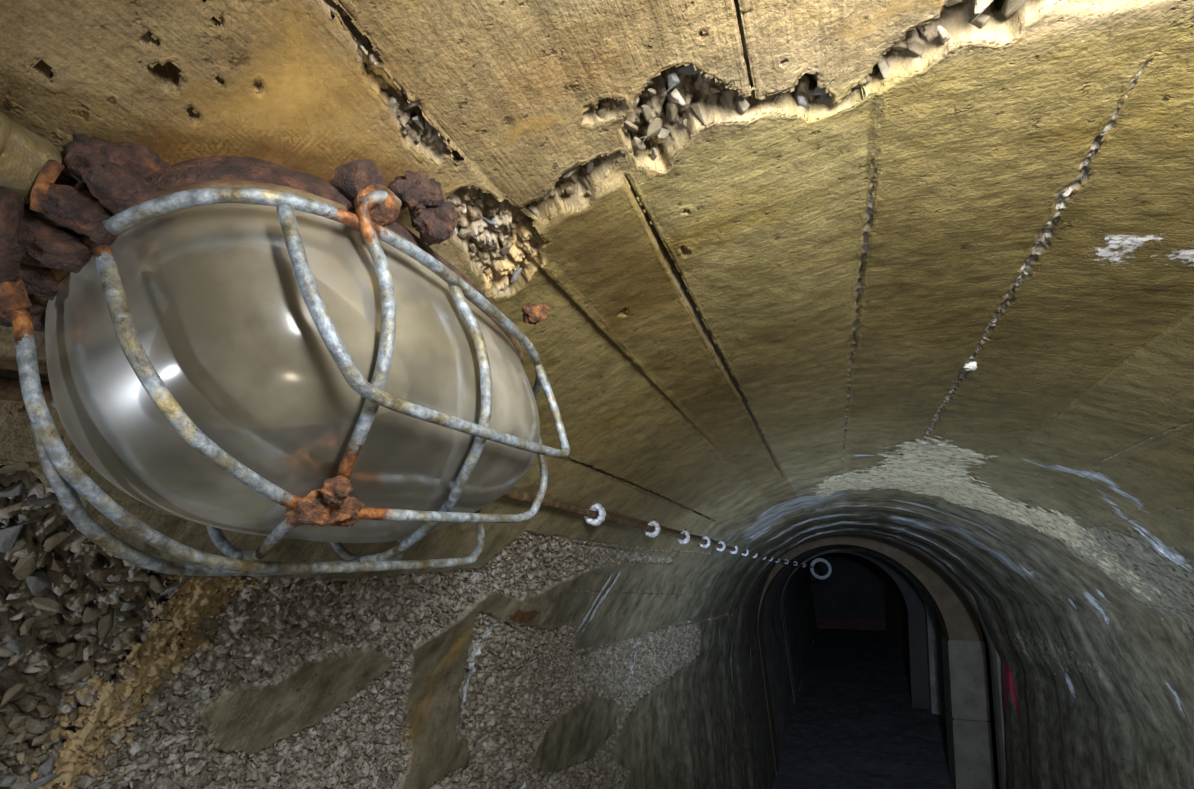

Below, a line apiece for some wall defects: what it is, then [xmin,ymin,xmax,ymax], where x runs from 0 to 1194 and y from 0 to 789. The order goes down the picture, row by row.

crack [300,0,469,166]
spalling [307,0,1070,304]
crack [921,52,1167,441]
damp [1096,234,1162,263]
damp [1152,249,1194,266]
damp [742,477,1038,642]
damp [1069,588,1109,624]
damp [1025,460,1191,572]